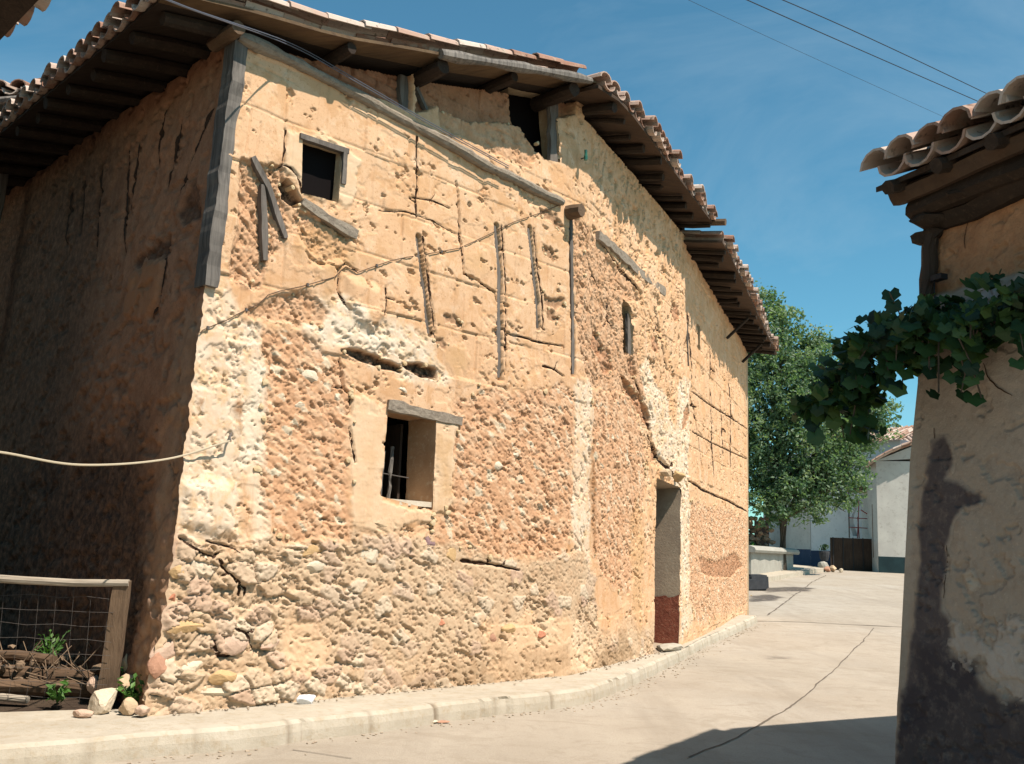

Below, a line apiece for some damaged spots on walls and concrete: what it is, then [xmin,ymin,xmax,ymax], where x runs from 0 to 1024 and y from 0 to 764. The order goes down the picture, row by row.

crack [65,108,215,253]
crack [153,245,171,317]
flaking render [228,156,439,550]
flaking render [428,312,464,351]
crack [621,312,747,512]
flaking render [681,403,690,432]
flaking render [588,328,658,596]
crack [178,538,246,597]
crack [460,559,518,571]